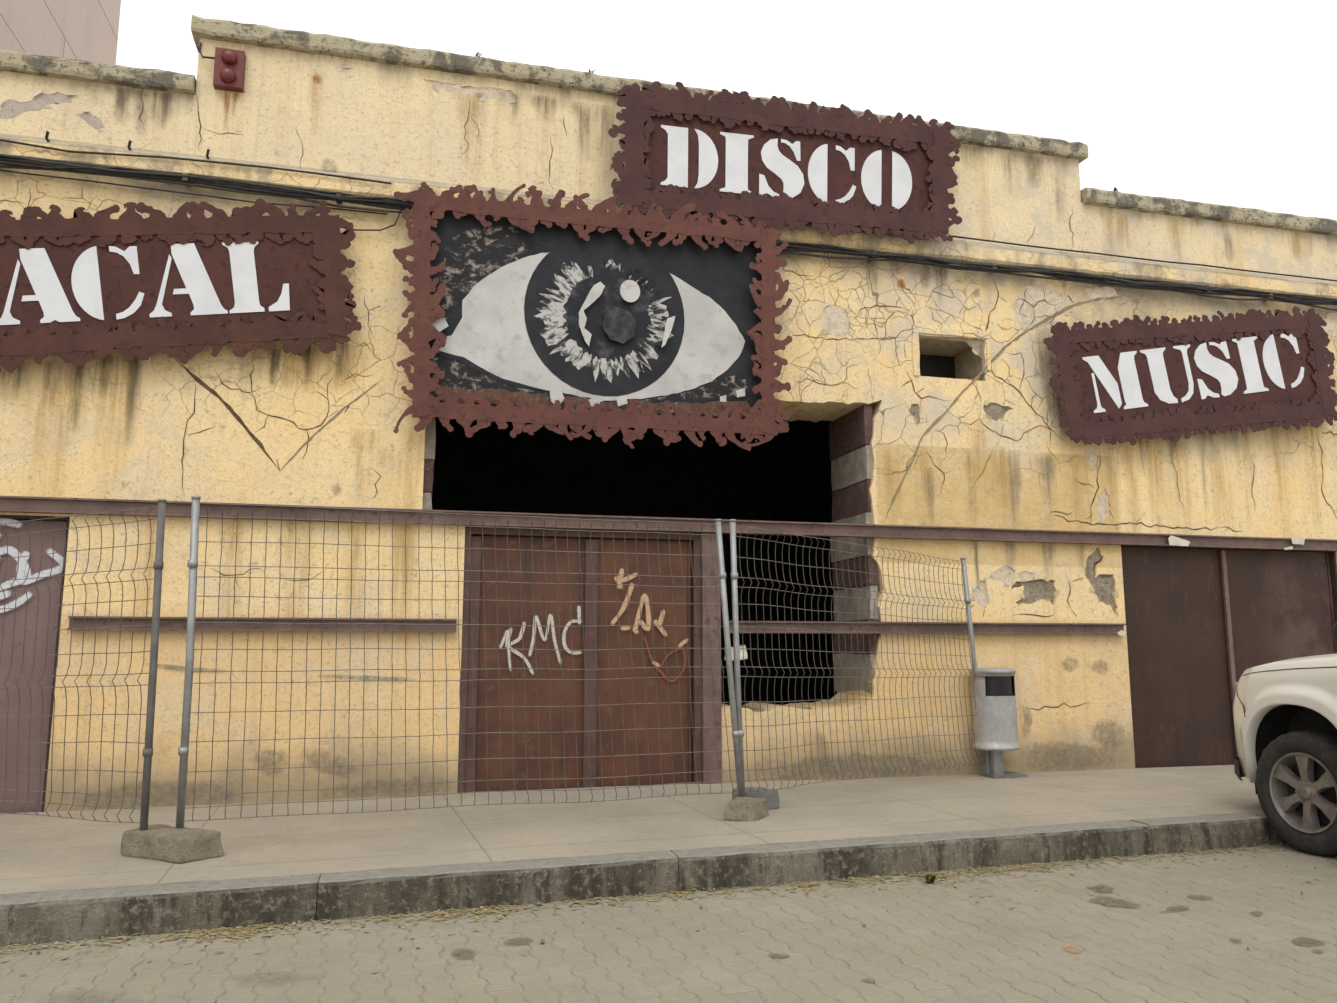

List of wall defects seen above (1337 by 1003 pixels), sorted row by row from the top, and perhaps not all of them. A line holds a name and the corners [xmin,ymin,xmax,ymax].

peeling [0,89,104,132]
leakage [117,88,129,109]
leakage [128,357,139,413]
crack [177,298,382,495]
crack [791,279,1121,518]
crack [1053,452,1237,532]
crack [1318,431,1337,518]
flaking render [971,565,1060,609]
flaking render [1083,549,1126,636]